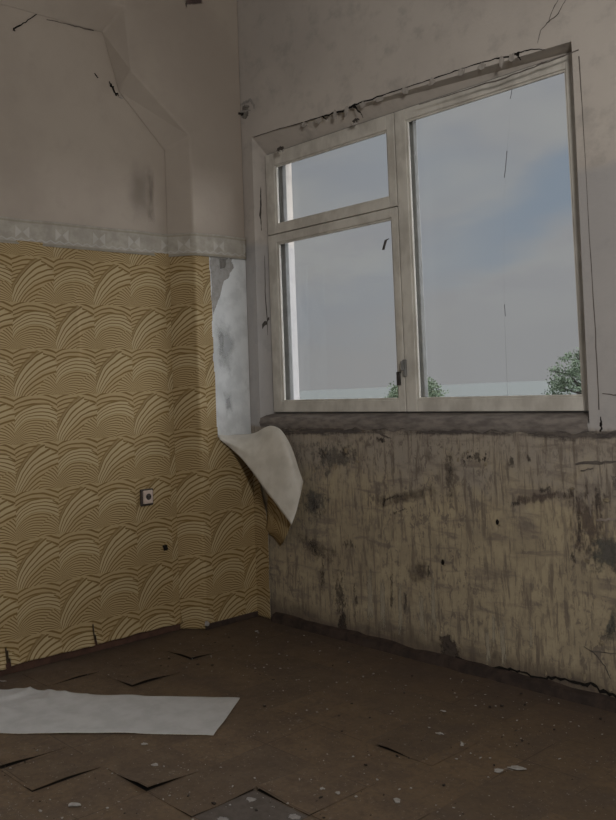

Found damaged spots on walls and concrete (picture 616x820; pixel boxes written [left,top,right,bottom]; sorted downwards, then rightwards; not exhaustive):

crack [13,14,94,31]
crack [255,0,566,137]
peeling [195,790,308,820]